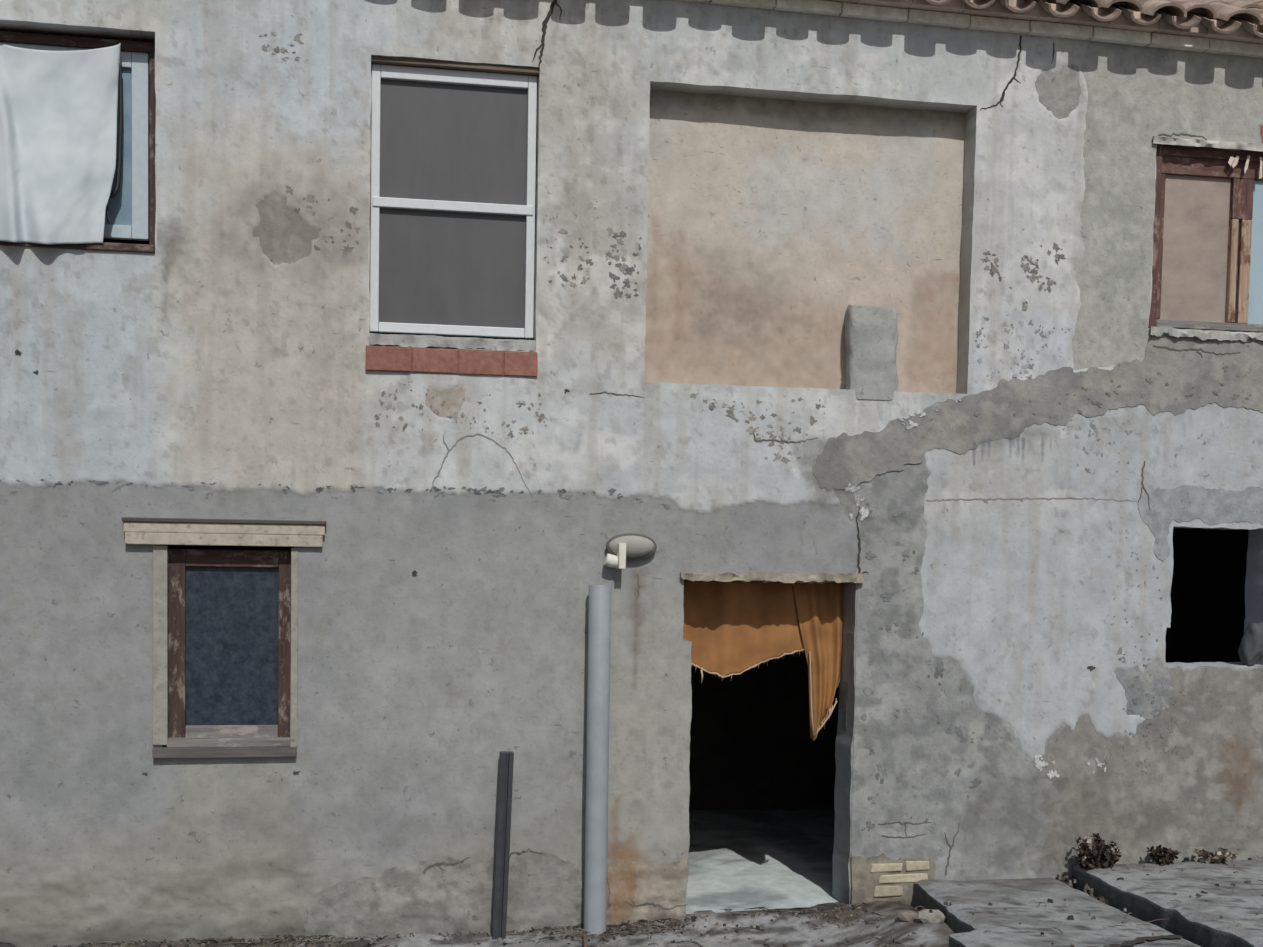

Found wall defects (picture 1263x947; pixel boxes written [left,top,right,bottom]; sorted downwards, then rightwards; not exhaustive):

crack [532,0,562,67]
crack [980,36,1022,110]
peeling [252,185,360,265]
peeling [544,228,642,299]
flaking render [975,41,1263,475]
crack [429,433,531,493]
peeling [690,393,825,464]
peeling [901,409,938,430]
crack [856,506,868,574]
spalling [834,457,1263,906]